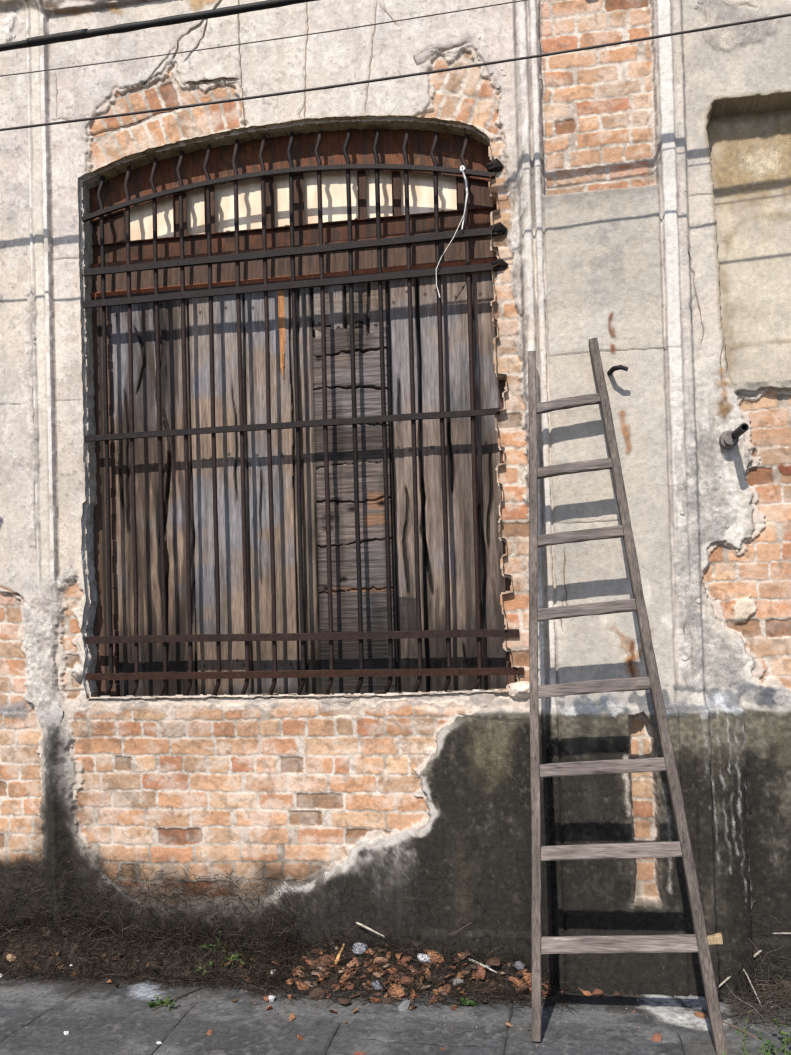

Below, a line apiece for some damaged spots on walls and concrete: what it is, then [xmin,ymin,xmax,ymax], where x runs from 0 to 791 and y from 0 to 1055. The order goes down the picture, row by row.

crack [88,109,177,136]
spalling [87,63,248,179]
crack [142,0,245,127]
crack [299,2,308,123]
crack [413,41,468,65]
spalling [539,0,656,196]
spalling [411,33,545,698]
spalling [673,389,791,693]
spalling [0,563,482,907]
corrosion [623,638,643,678]
water stain [706,692,744,714]
water stain [0,714,791,999]